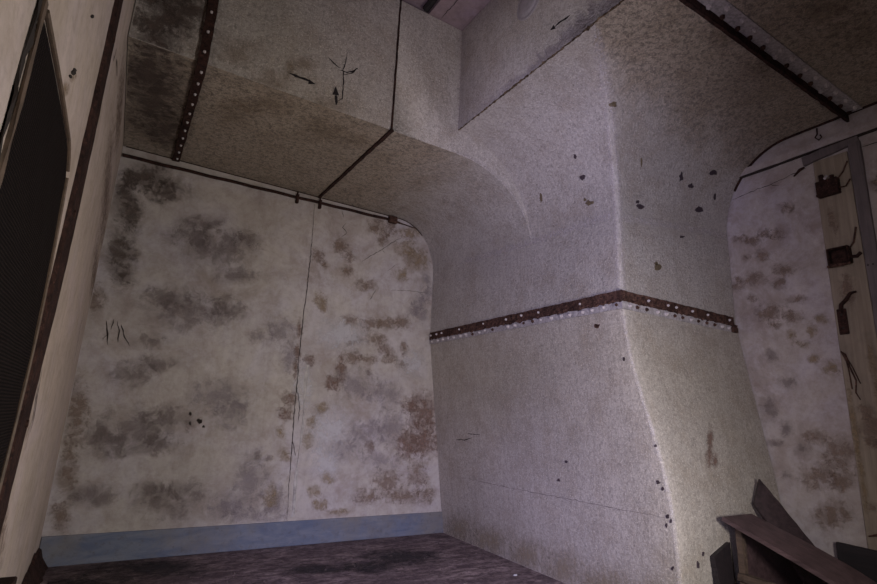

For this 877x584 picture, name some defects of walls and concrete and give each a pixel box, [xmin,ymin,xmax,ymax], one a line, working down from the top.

water stain [102,146,176,283]
crack [287,204,315,513]
water stain [355,466,433,504]